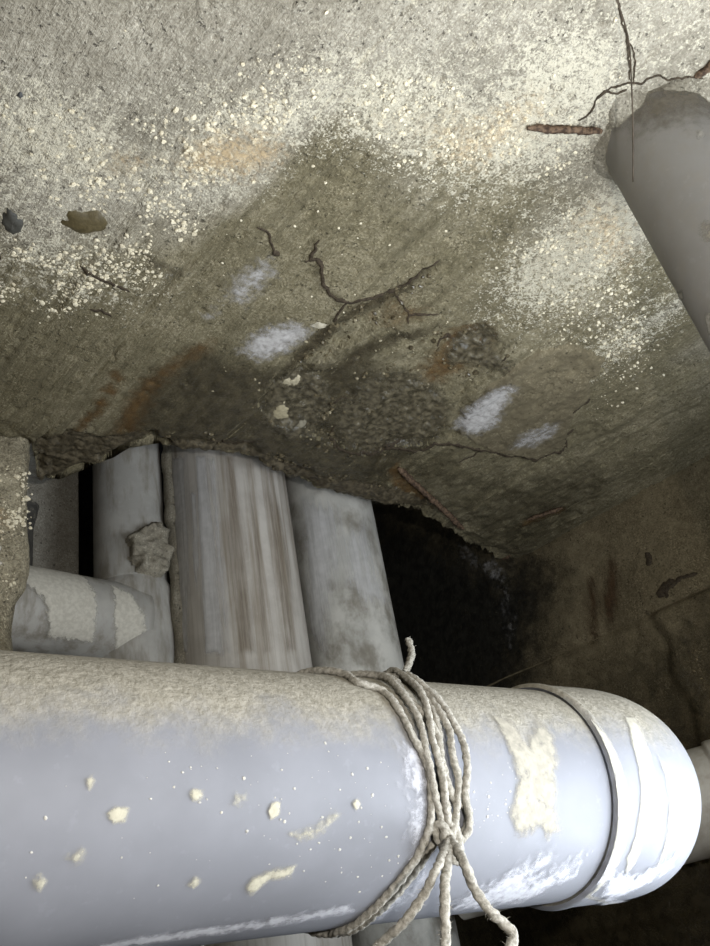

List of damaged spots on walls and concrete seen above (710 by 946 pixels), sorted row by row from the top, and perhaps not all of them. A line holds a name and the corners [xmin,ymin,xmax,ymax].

crack [578,0,703,121]
rust [694,61,710,79]
damp [343,74,554,174]
rust [527,124,603,136]
damp [0,54,331,319]
crack [257,227,280,257]
crack [305,240,455,347]
damp [503,196,665,420]
spalling [32,430,434,509]
damp [127,274,438,486]
crack [325,397,591,463]
damp [456,387,515,432]